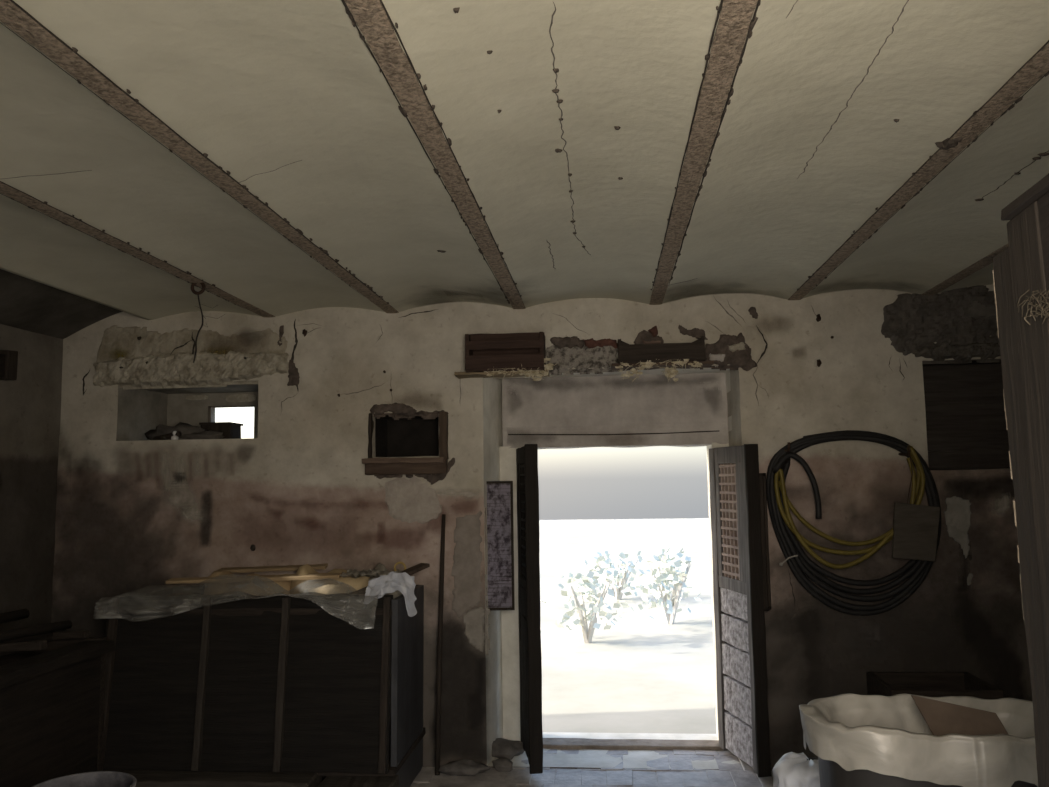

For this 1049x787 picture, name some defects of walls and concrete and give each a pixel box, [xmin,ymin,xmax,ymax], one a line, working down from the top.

crack [797,0,909,179]
crack [549,2,591,255]
crack [975,151,1049,201]
flaking render [97,325,300,386]
crack [291,319,325,360]
flaking render [550,336,618,349]
flaking render [634,326,664,344]
flaking render [678,325,708,340]
flaking render [881,270,1001,364]
leakage [52,466,169,636]
leakage [163,454,212,544]
flaking render [943,496,972,560]